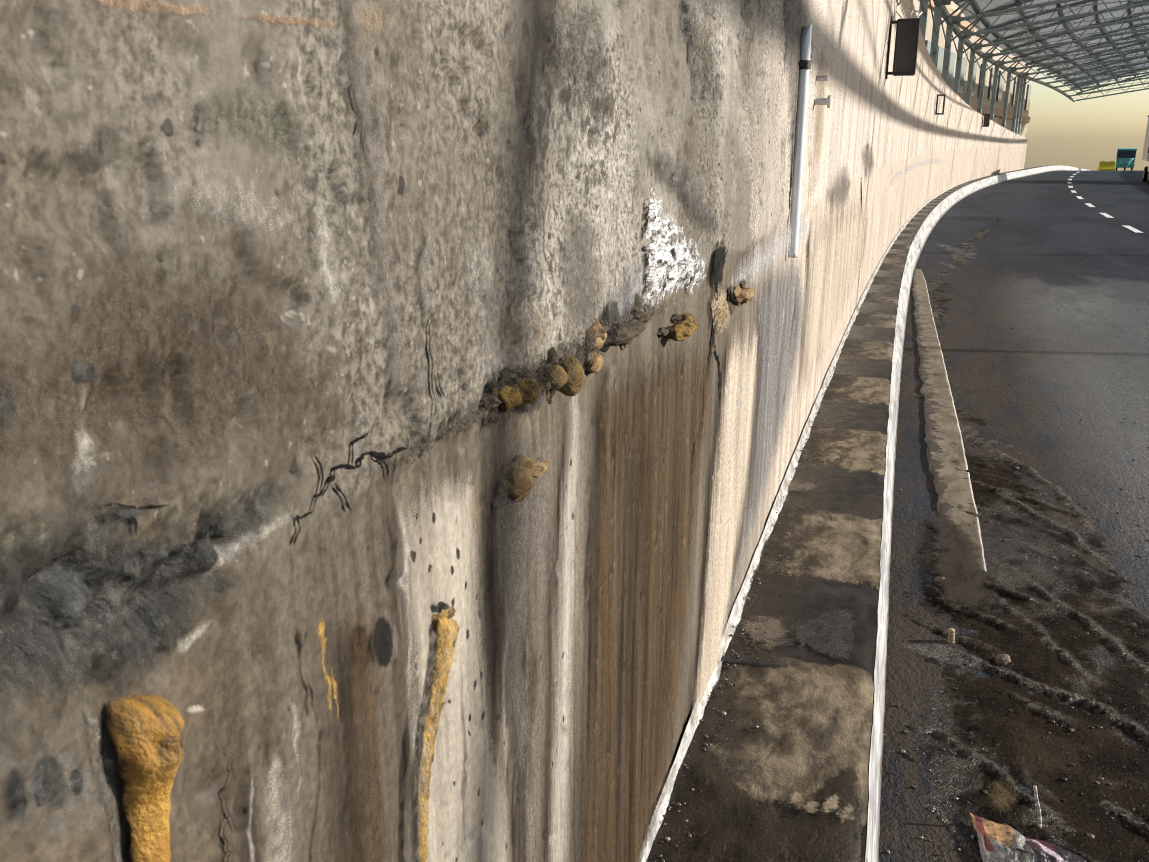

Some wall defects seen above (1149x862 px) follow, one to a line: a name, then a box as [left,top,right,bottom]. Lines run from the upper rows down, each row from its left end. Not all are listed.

spalling [0,482,290,734]
rust [318,622,339,716]
crack [286,309,446,544]
rust [419,601,460,862]
leakage [551,411,577,862]
crack [708,286,721,400]
leakage [586,175,870,862]